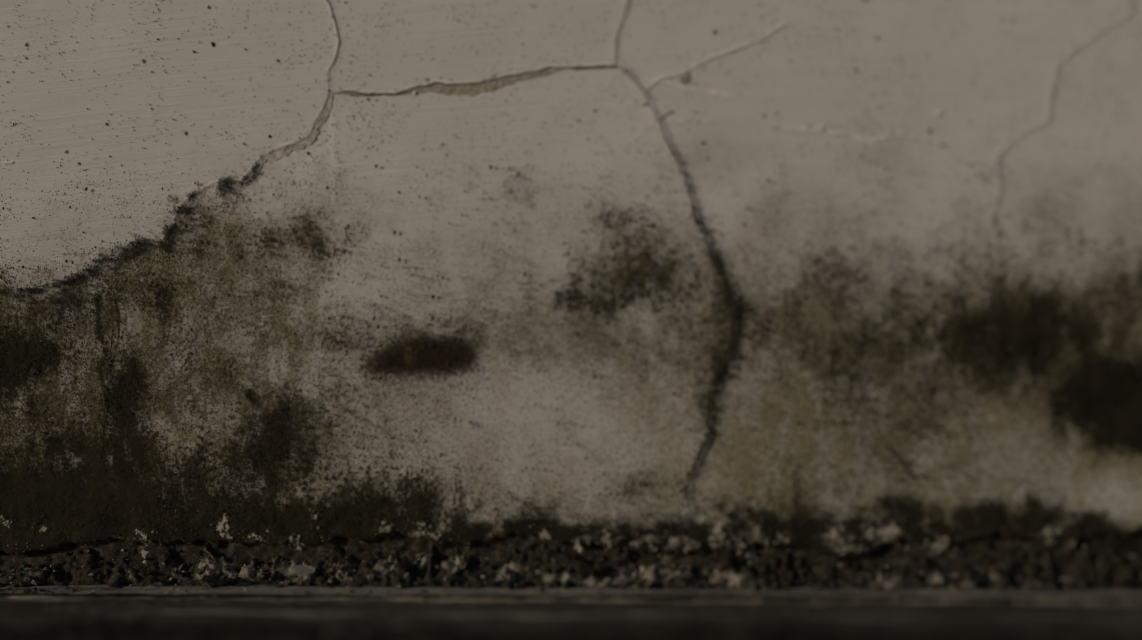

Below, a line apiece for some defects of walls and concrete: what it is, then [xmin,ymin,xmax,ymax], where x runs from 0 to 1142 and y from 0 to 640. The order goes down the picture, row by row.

crack [324,0,340,90]
crack [974,0,1137,233]
crack [614,0,742,511]
flaking render [110,519,198,559]
flaking render [210,500,512,550]
flaking render [483,513,792,559]
flaking render [814,509,987,556]